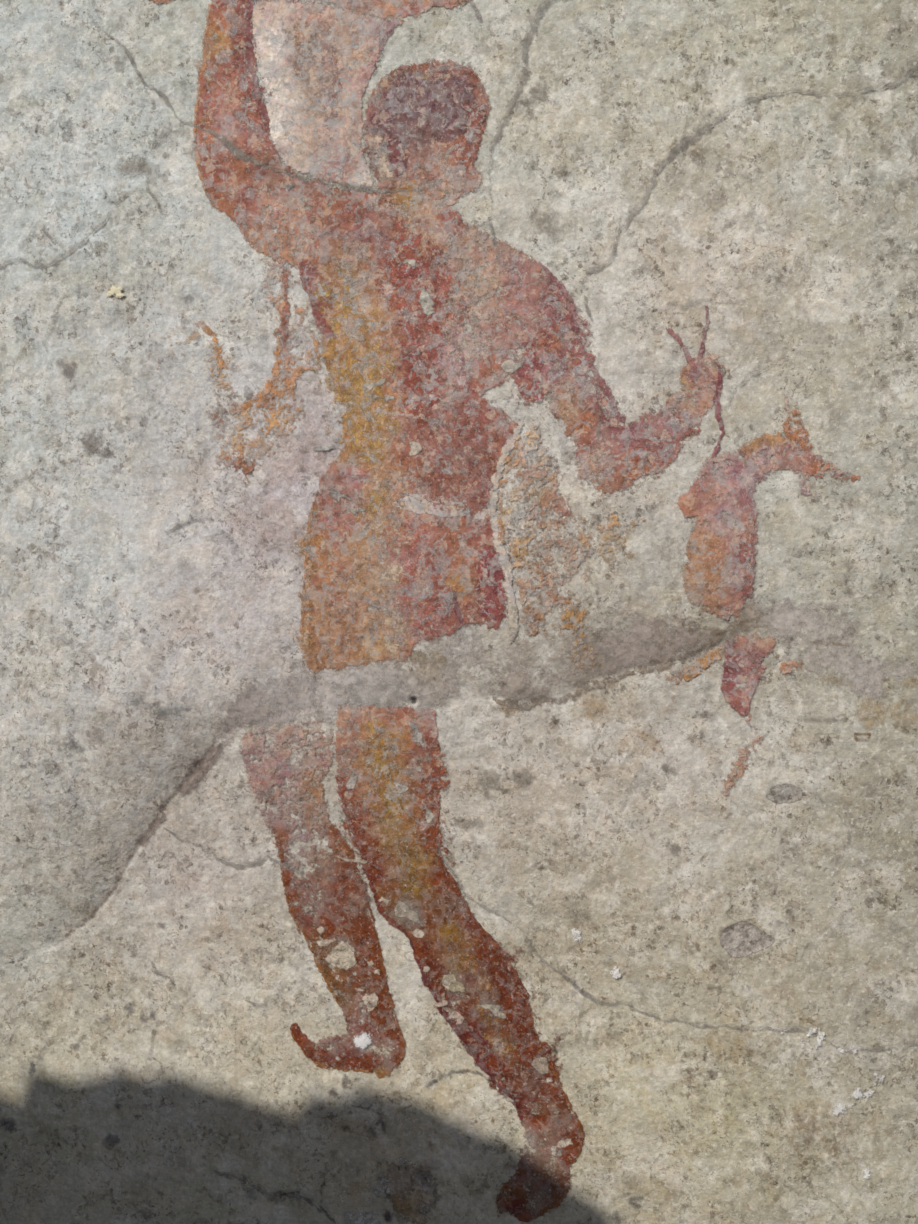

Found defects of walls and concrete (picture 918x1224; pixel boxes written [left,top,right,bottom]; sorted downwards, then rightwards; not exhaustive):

crack [0,163,161,268]
crack [104,31,418,194]
crack [458,0,550,246]
crack [581,61,918,320]
crack [163,827,302,874]